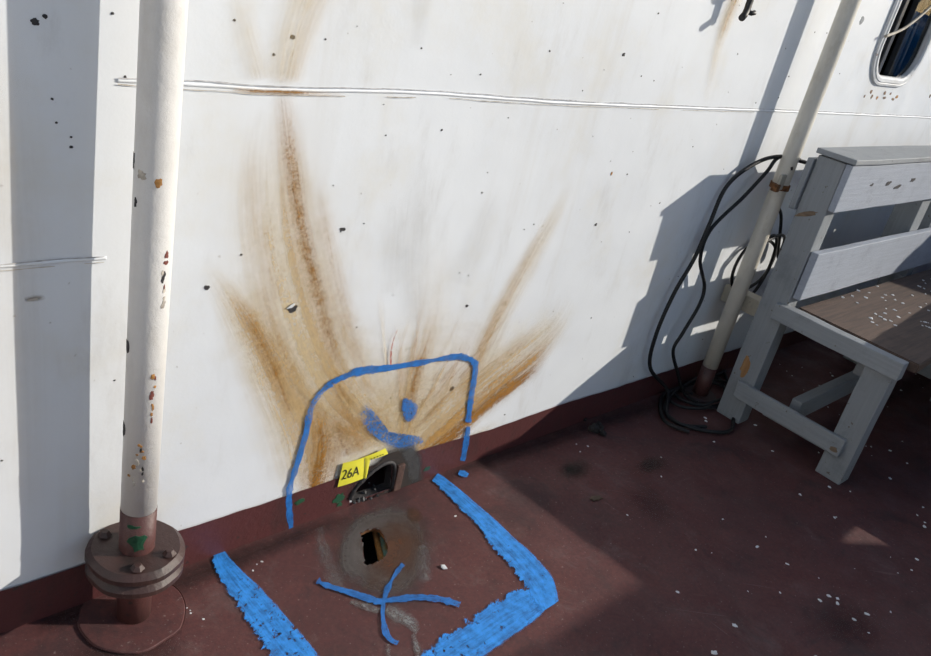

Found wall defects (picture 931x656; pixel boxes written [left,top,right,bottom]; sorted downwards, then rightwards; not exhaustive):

rust [236,238,384,487]
rust [415,341,539,450]
peeling [127,444,146,486]
rust [392,463,405,492]
peeling [339,507,427,594]
peeling [350,601,417,632]